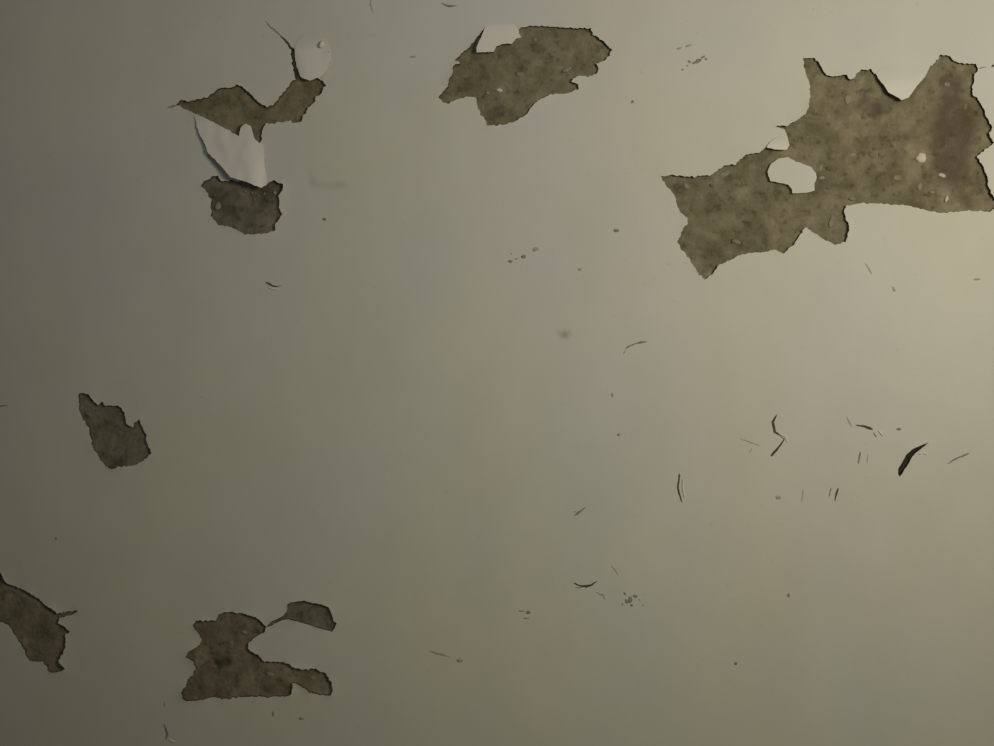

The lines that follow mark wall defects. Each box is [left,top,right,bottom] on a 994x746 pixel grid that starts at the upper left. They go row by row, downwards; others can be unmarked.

peeling [439,23,611,126]
peeling [167,23,330,235]
peeling [662,56,994,279]
peeling [80,393,152,469]
peeling [0,573,78,672]
peeling [183,600,337,700]